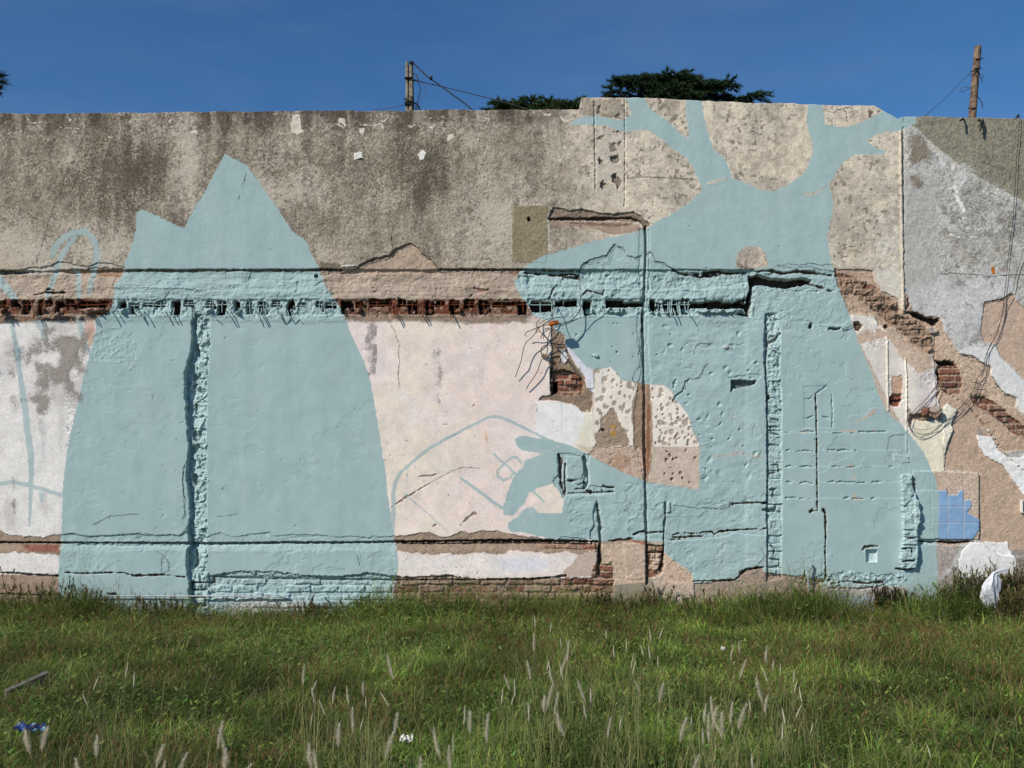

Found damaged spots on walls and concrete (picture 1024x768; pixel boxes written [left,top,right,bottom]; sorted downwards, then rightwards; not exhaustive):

crack [357,227,437,267]
crack [581,244,671,276]
water stain [14,327,90,415]
flaking render [0,244,1024,619]
crack [213,569,318,577]